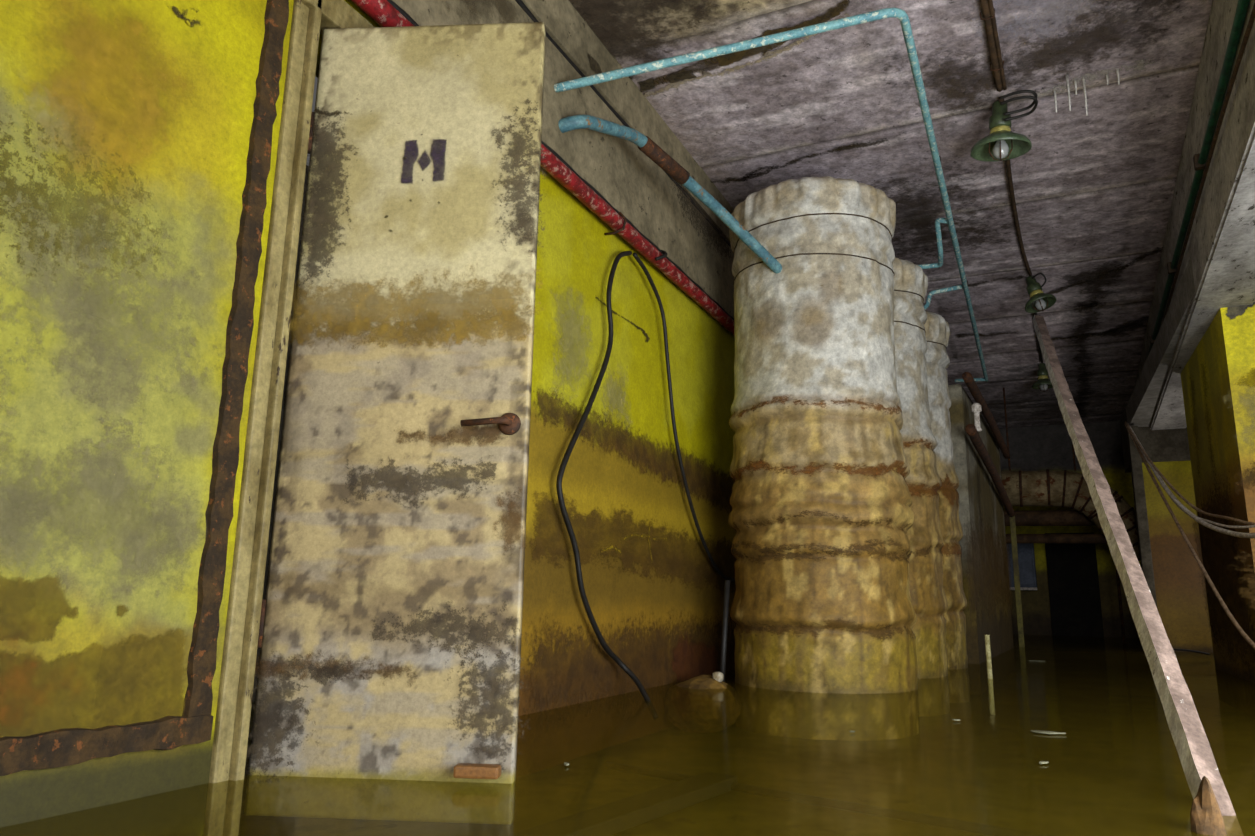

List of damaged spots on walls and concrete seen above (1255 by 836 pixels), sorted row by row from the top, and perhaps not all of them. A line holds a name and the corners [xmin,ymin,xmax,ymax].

crack [172,6,200,27]
water stain [570,0,717,79]
water stain [919,0,1180,115]
water stain [871,164,1014,264]
water stain [1064,261,1149,418]
water stain [345,455,497,509]
water stain [530,493,737,595]
water stain [534,389,735,514]
water stain [1193,462,1255,677]
water stain [0,576,185,738]
mould [246,656,315,784]
water stain [372,604,735,770]